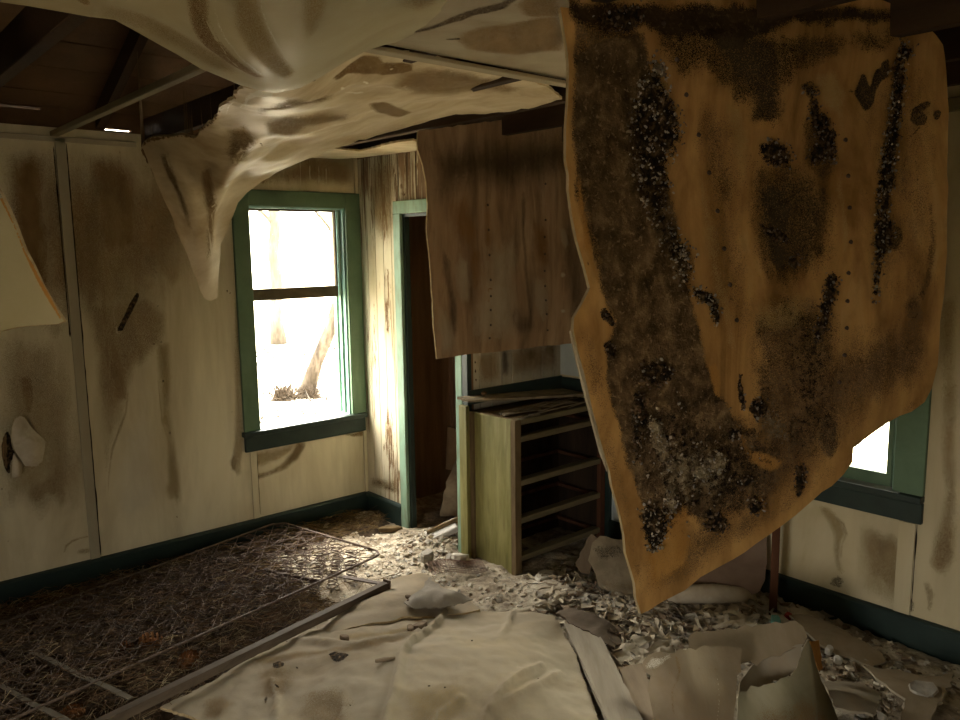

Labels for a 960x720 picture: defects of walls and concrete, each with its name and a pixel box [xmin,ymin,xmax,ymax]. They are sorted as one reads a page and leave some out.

water stain [225,55,519,164]
water stain [201,168,218,257]
water stain [0,146,192,519]
water stain [579,38,960,603]
hole [1,432,15,473]
peeling [640,415,732,592]
peeling [741,434,783,471]